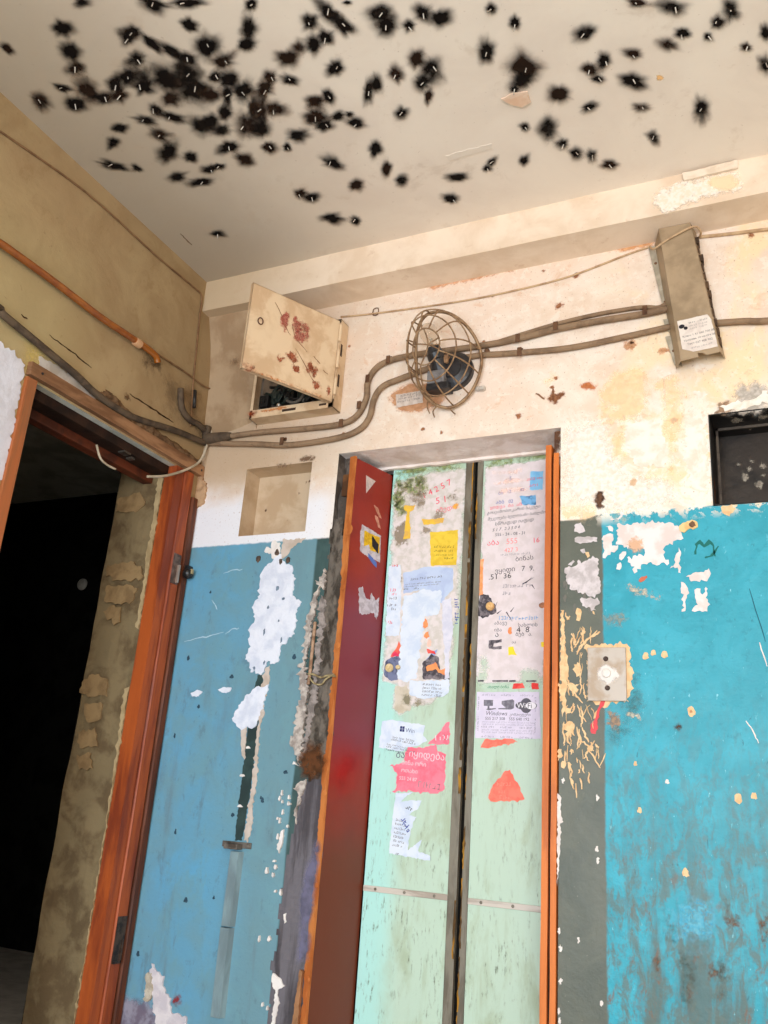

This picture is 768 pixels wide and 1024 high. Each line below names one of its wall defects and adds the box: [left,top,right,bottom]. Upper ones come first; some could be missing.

peeling [501,91,531,108]
peeling [653,173,743,213]
flaking render [0,341,25,480]
crack [130,394,173,422]
corrosion [536,376,565,404]
peeling [256,538,305,564]
spalling [283,517,343,774]
peeling [560,608,582,656]
peeling [558,641,668,736]
flaking render [76,674,109,771]
spalling [258,779,323,1024]
flaking render [143,963,188,1024]